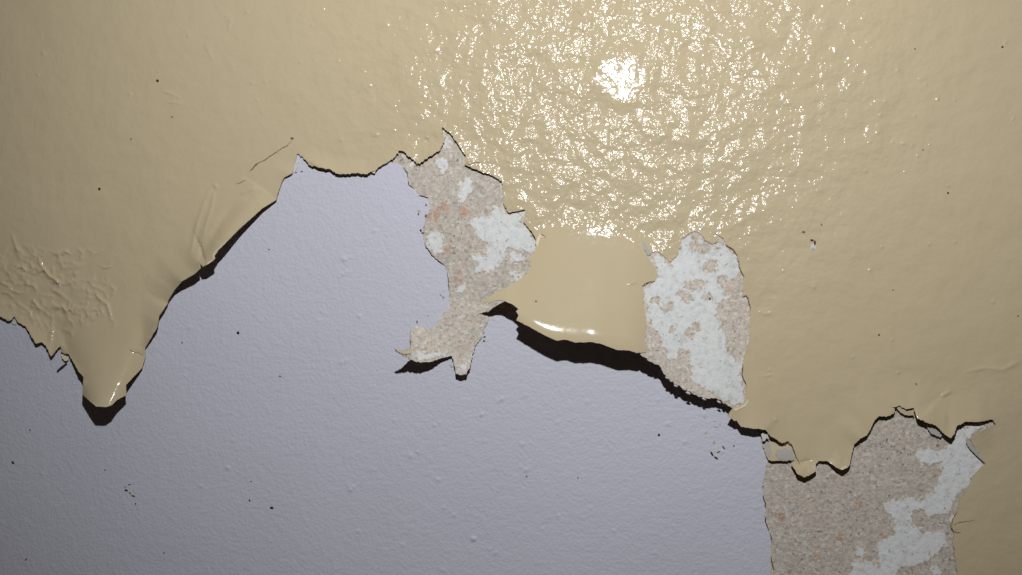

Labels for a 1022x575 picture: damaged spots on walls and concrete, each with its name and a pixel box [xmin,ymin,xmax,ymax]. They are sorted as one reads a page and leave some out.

crack [237,141,291,184]
flaking render [0,114,1004,575]